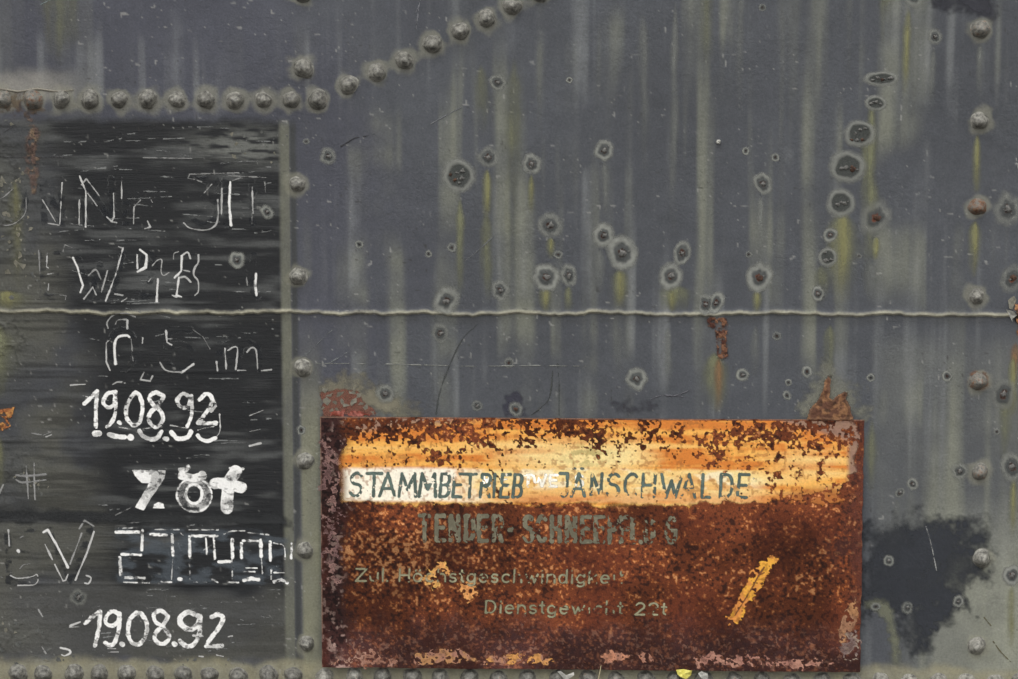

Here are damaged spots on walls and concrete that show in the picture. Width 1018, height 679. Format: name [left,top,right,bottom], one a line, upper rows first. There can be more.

water stain [933,0,992,19]
rust [707,317,728,359]
rust [807,375,854,420]
rust [0,407,15,431]
water stain [861,518,990,662]